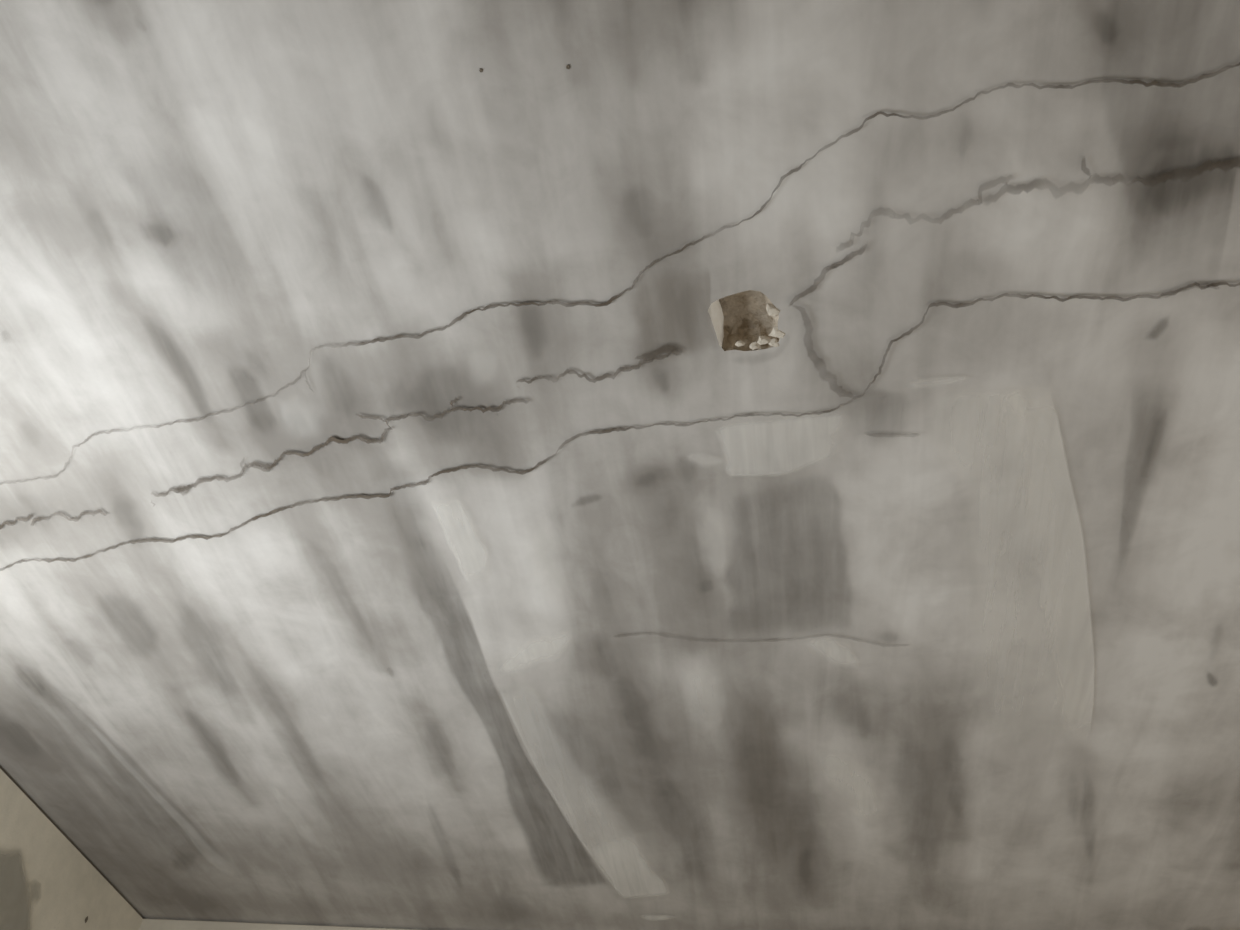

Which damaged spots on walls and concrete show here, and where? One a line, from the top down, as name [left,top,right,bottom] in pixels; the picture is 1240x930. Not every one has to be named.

crack [1039,62,1240,89]
crack [851,112,907,134]
crack [742,162,805,222]
crack [1158,157,1240,182]
crack [356,239,702,346]
spalling [708,290,785,351]
crack [800,256,850,296]
crack [870,299,980,384]
crack [1020,282,1240,302]
crack [264,345,678,471]
crack [0,408,836,568]